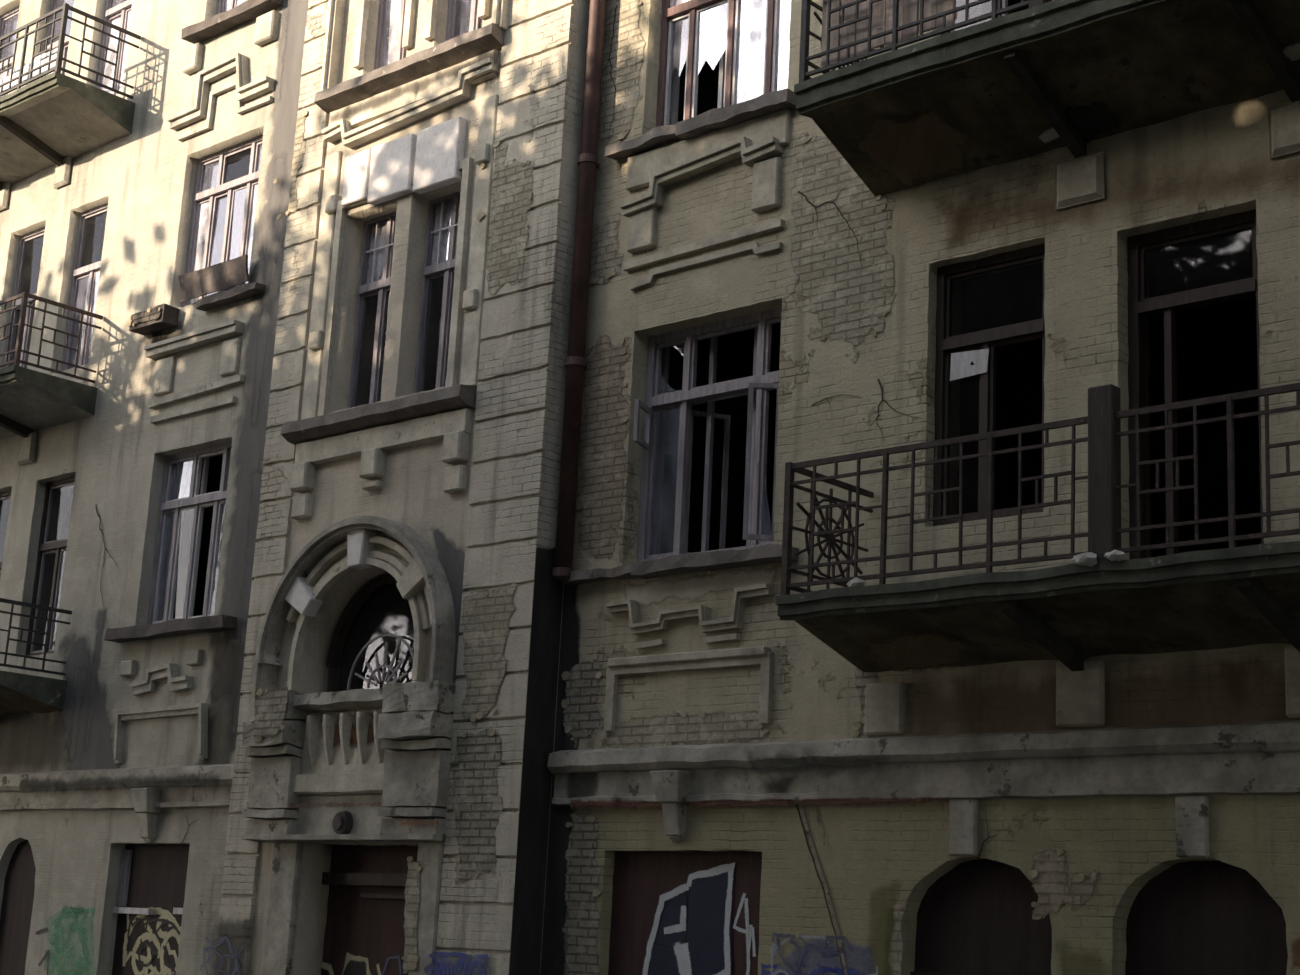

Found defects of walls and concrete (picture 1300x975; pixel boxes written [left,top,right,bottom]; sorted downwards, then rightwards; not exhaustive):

spalling [598,0,645,142]
water stain [1039,128,1060,143]
crack [798,188,863,269]
spalling [790,132,896,364]
water stain [0,0,310,792]
crack [811,379,919,435]
crack [96,504,117,628]
spalling [561,661,771,749]
spalling [453,727,503,885]
spalling [401,856,422,973]
spalling [562,813,601,975]
spalling [1029,847,1075,920]